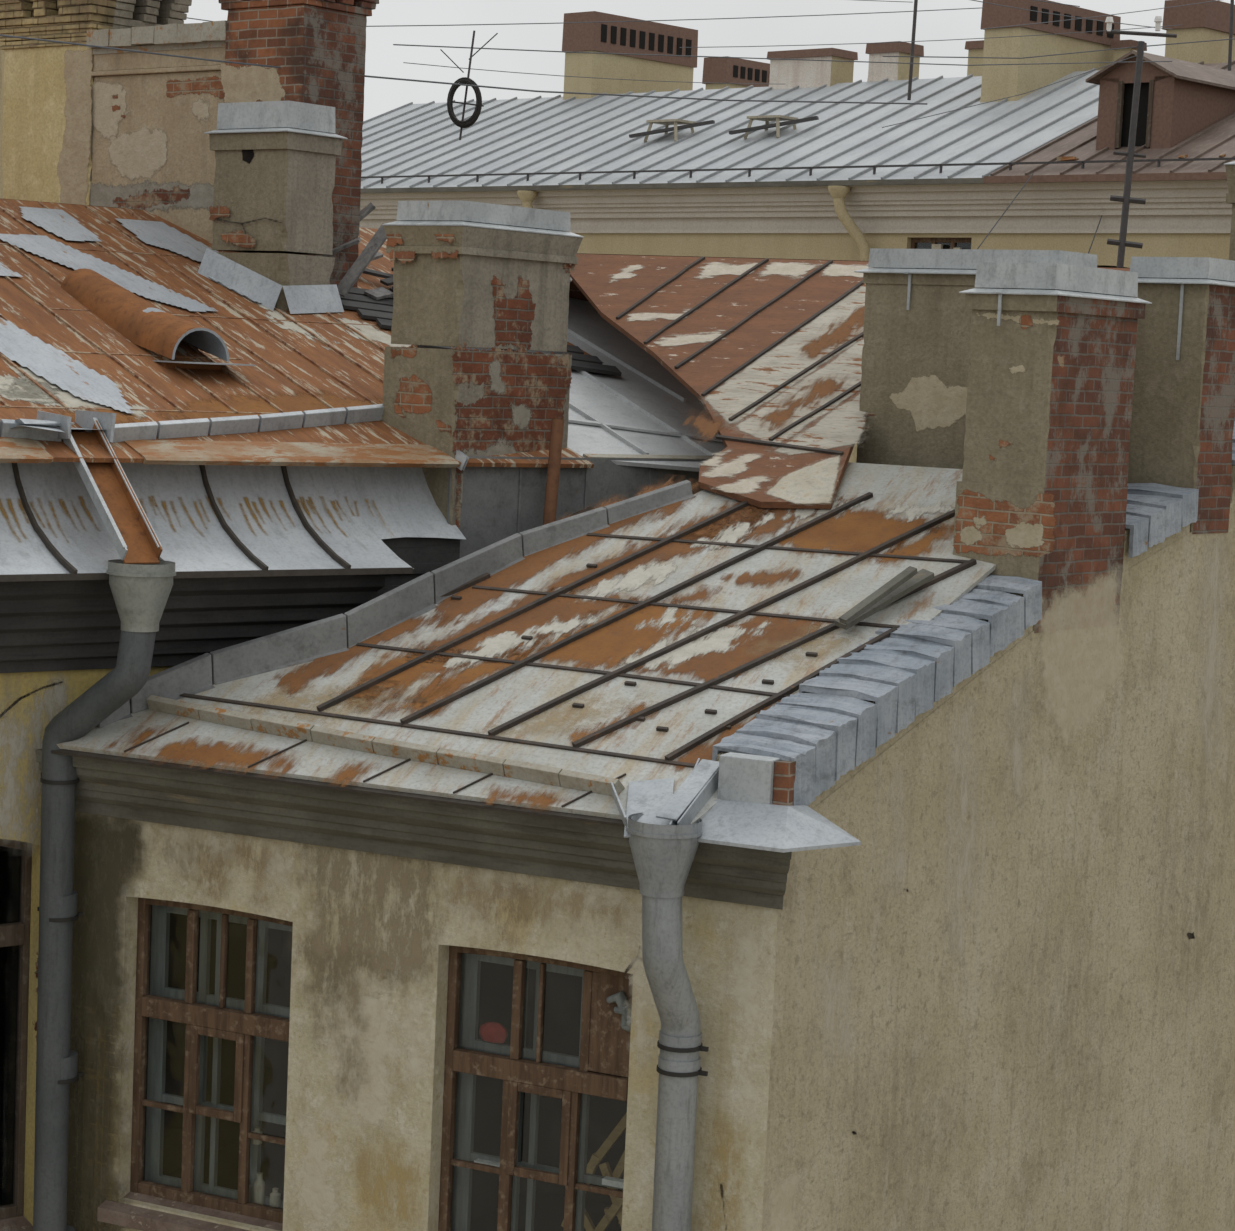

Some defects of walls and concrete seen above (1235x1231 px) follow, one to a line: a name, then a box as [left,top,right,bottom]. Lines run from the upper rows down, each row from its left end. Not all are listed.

peeling [57,49,232,221]
peeling [257,303,418,359]
corrosion [802,306,865,358]
corrosion [161,390,383,420]
spalling [393,275,572,530]
corrosion [762,378,844,430]
peeling [436,561,677,676]
corrosion [276,478,954,718]
peeling [625,607,770,670]
damp [0,680,67,841]
corrosion [129,729,293,775]
damp [305,848,432,1022]